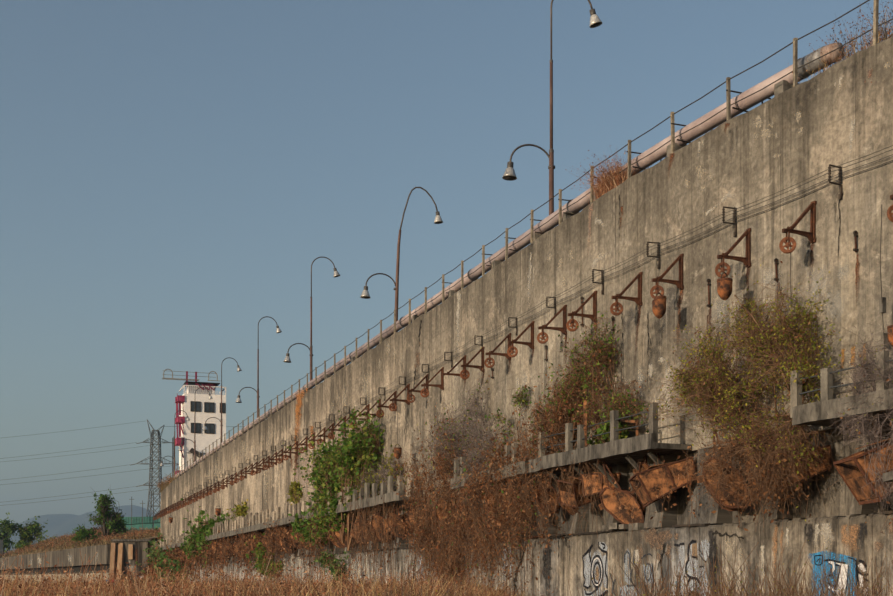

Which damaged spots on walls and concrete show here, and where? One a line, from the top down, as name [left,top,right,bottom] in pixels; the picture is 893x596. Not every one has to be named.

crack [713,530,744,542]